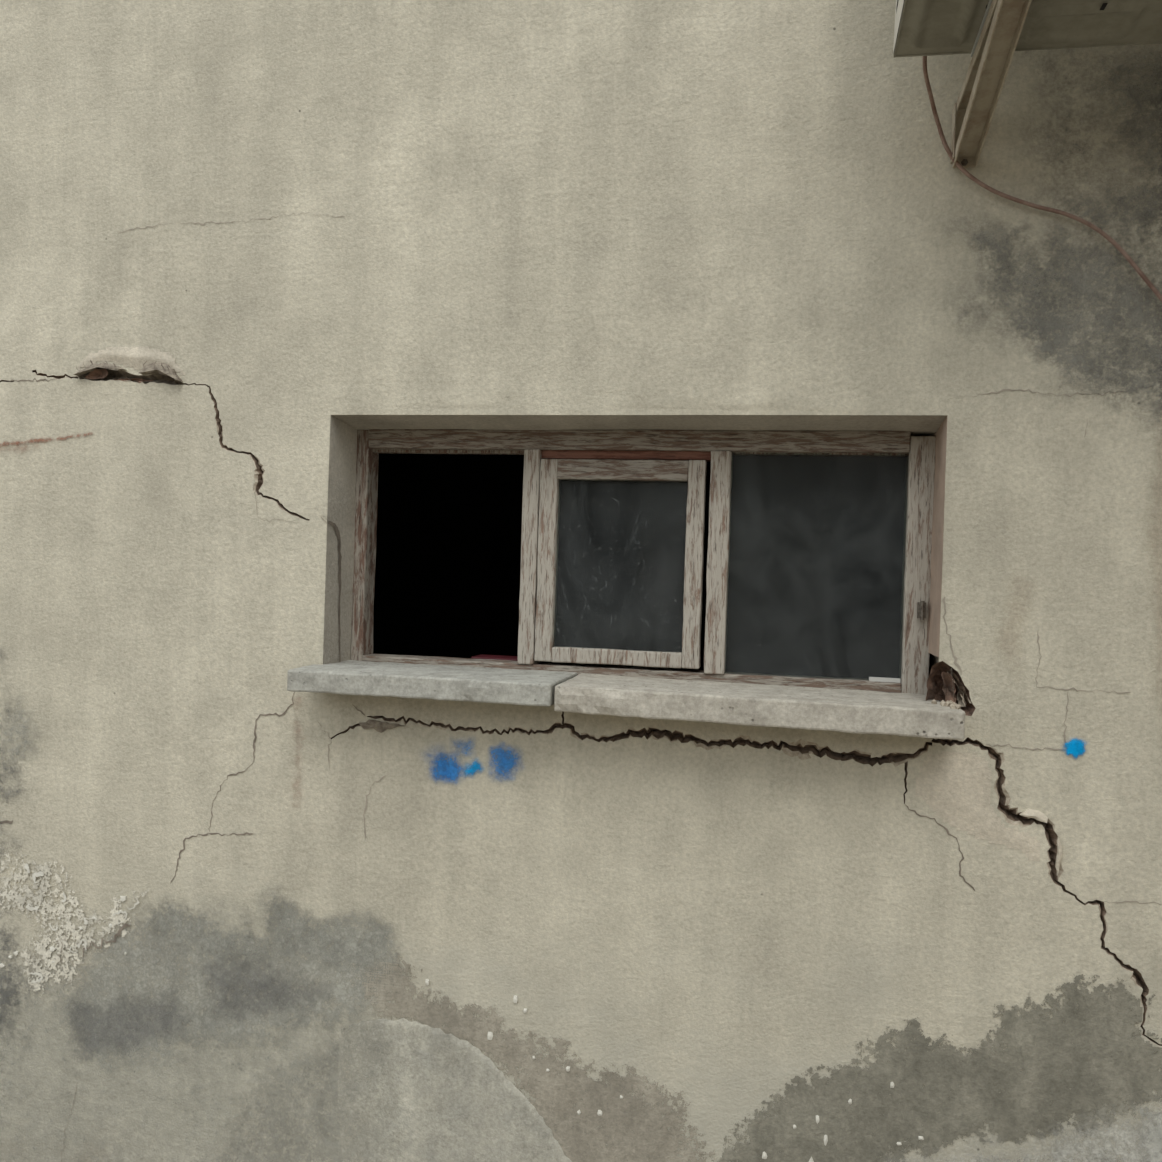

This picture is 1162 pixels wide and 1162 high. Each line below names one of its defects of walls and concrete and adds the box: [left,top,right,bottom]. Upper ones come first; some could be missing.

crack [0,370,78,382]
corrosion [0,433,91,446]
crack [180,383,342,662]
damp [976,232,1162,404]
crack [170,692,295,884]
crack [318,632,1162,1046]
damp [0,931,48,1065]
damp [55,897,1162,1162]